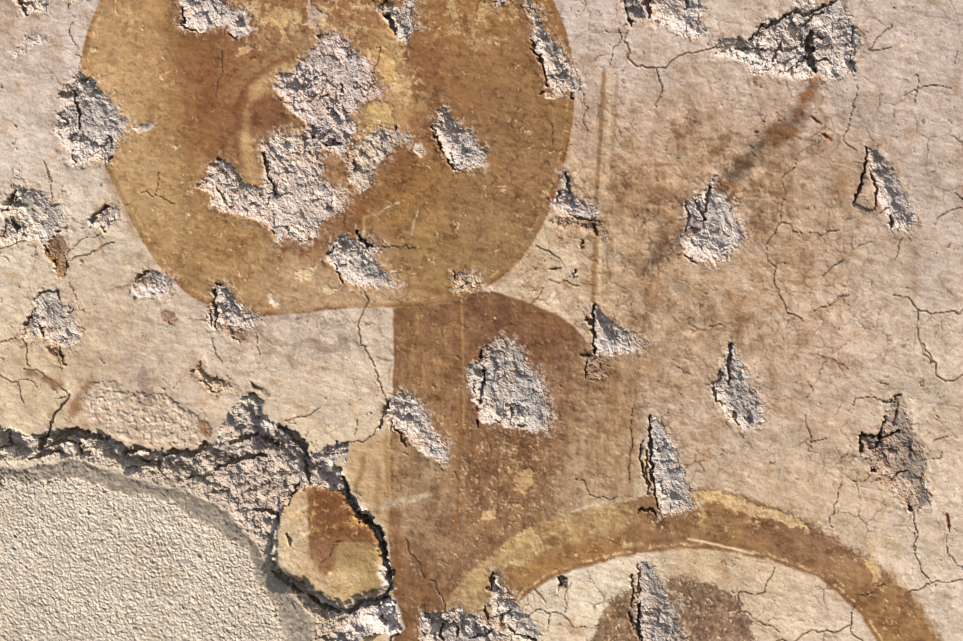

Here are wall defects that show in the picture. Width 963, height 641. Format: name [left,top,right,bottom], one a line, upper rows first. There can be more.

spalling [53,60,156,171]
spalling [194,0,431,295]
crack [611,30,720,107]
spalling [713,0,868,90]
crack [0,322,69,438]
crack [357,293,386,397]
spalling [467,337,563,435]
crack [893,295,963,382]
spalling [639,410,812,534]
spalling [835,394,932,515]
crack [738,567,887,641]
crack [908,511,963,594]